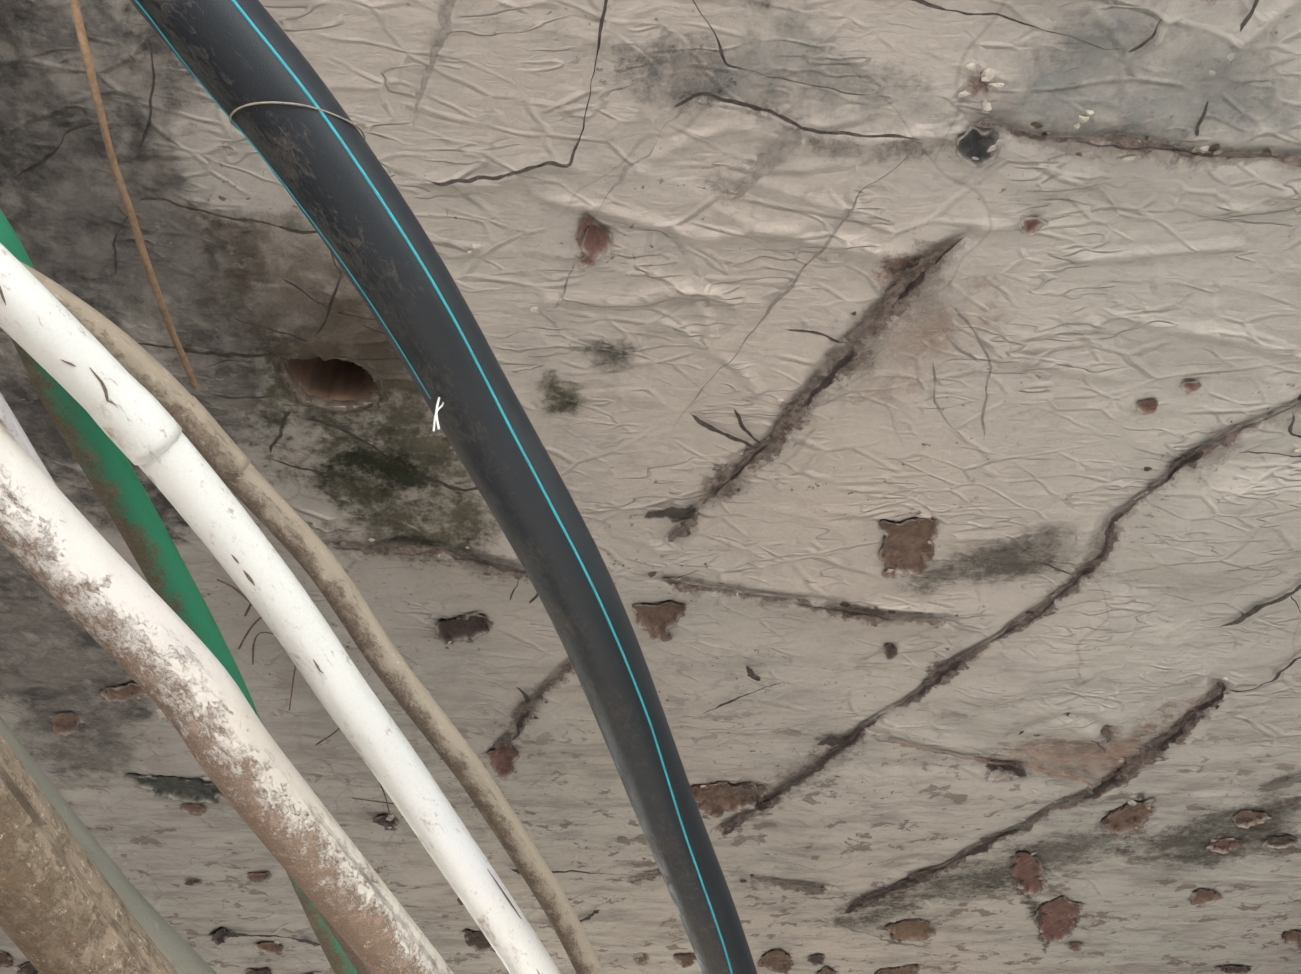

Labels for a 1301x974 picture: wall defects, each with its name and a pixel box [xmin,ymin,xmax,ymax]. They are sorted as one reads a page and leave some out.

crack [911,0,1162,52]
crack [974,101,1301,167]
crack [555,0,964,542]
spalling [879,513,939,578]
crack [648,570,943,626]
damp [0,554,152,777]
crack [720,394,1301,948]
spalling [1100,794,1156,836]
spalling [757,949,835,974]
spalling [875,964,919,974]
spalling [883,918,938,941]
spalling [1010,850,1084,951]